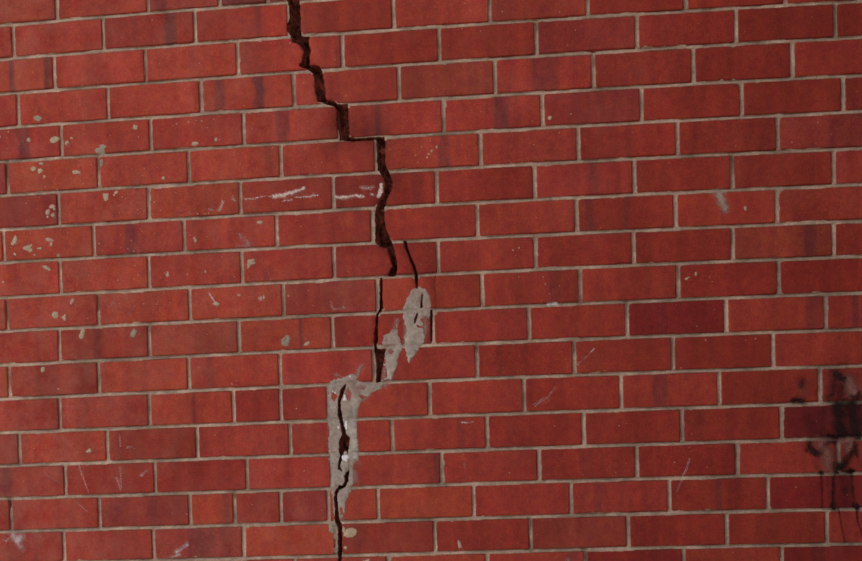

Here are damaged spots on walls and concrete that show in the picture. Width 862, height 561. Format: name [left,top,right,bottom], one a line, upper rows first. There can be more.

crack [286,0,436,383]
crack [334,384,350,561]